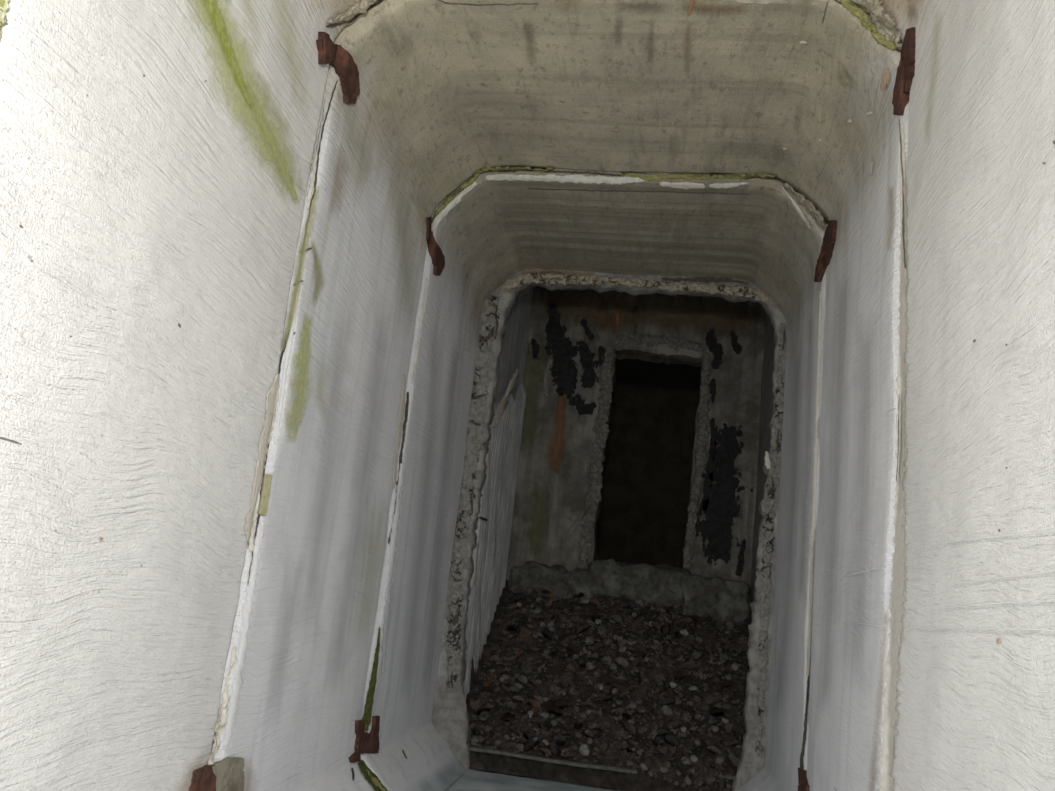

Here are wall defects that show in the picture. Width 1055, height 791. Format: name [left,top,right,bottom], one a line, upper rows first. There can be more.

damp [205,0,297,200]